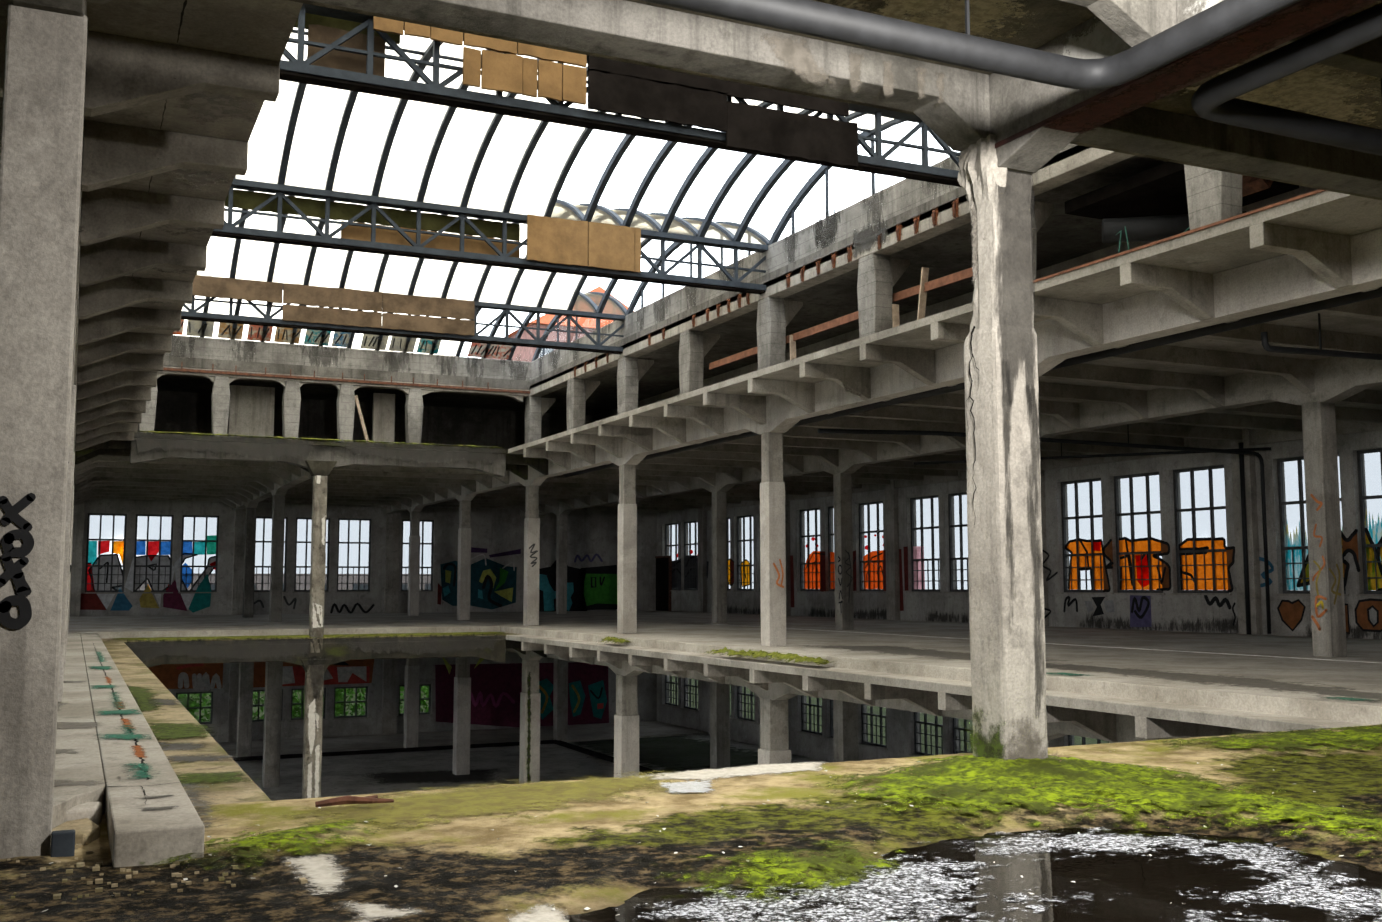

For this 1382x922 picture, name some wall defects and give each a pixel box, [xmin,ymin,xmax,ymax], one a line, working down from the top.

crack [177,0,187,43]
corrosion [877,198,959,250]
corrosion [786,245,853,288]
crack [966,326,979,525]